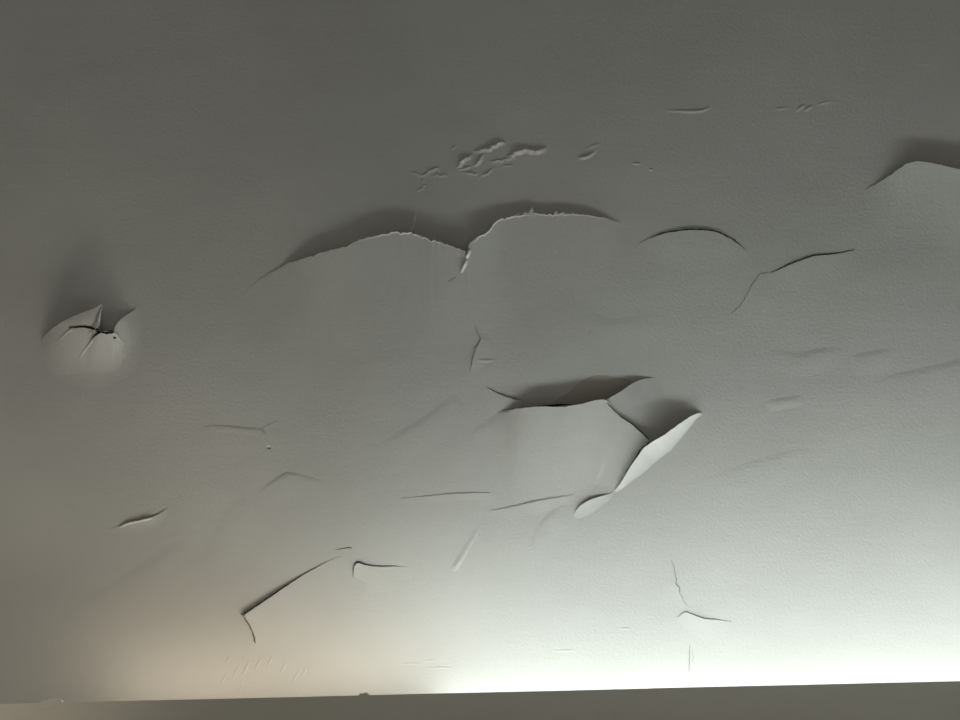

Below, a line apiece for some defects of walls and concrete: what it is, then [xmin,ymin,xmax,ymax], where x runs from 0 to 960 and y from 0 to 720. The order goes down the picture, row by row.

peeling [244,208,623,357]
crack [636,228,858,312]
peeling [483,375,703,519]
crack [101,508,169,535]
crack [397,492,579,521]
crack [241,547,414,652]
crack [664,560,732,665]